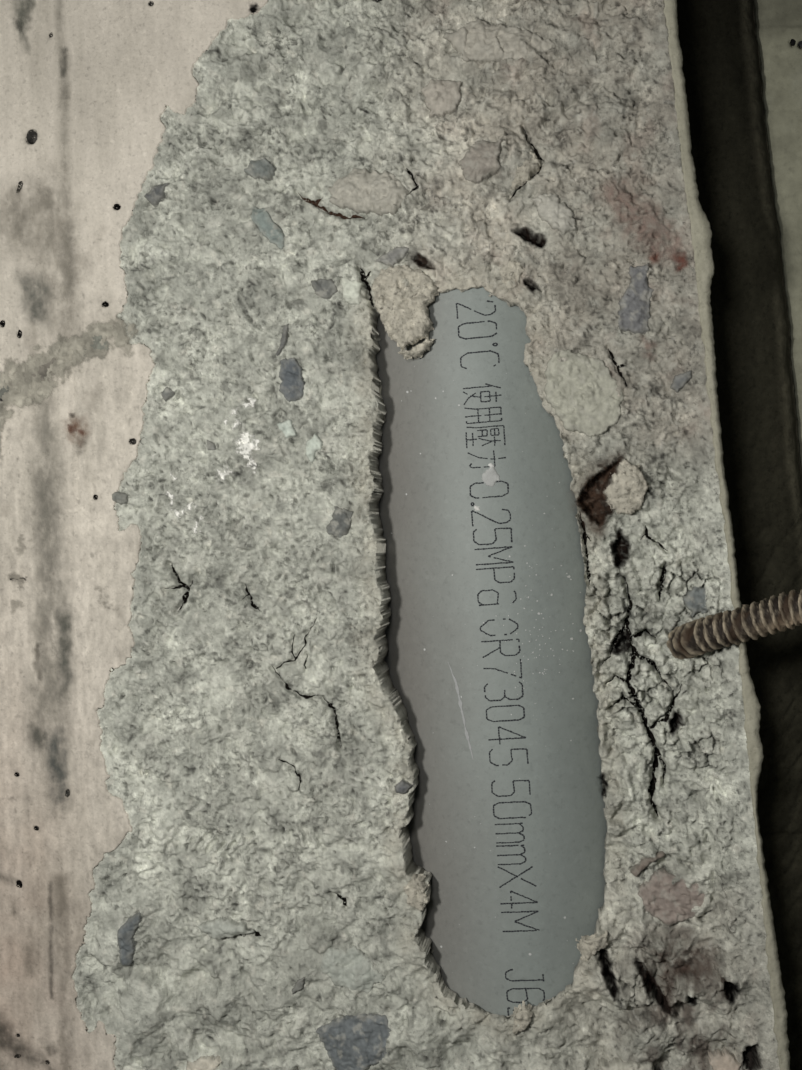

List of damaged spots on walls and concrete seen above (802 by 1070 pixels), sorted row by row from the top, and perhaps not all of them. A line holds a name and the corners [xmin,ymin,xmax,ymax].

spalling [443,19,556,64]
spalling [328,168,411,215]
spalling [532,193,577,235]
spalling [371,265,439,360]
spalling [544,349,624,437]
spalling [601,459,649,515]
crack [165,565,193,610]
crack [579,511,591,585]
crack [640,525,666,600]
crack [272,619,341,744]
crack [601,579,682,817]
water stain [34,730,64,779]